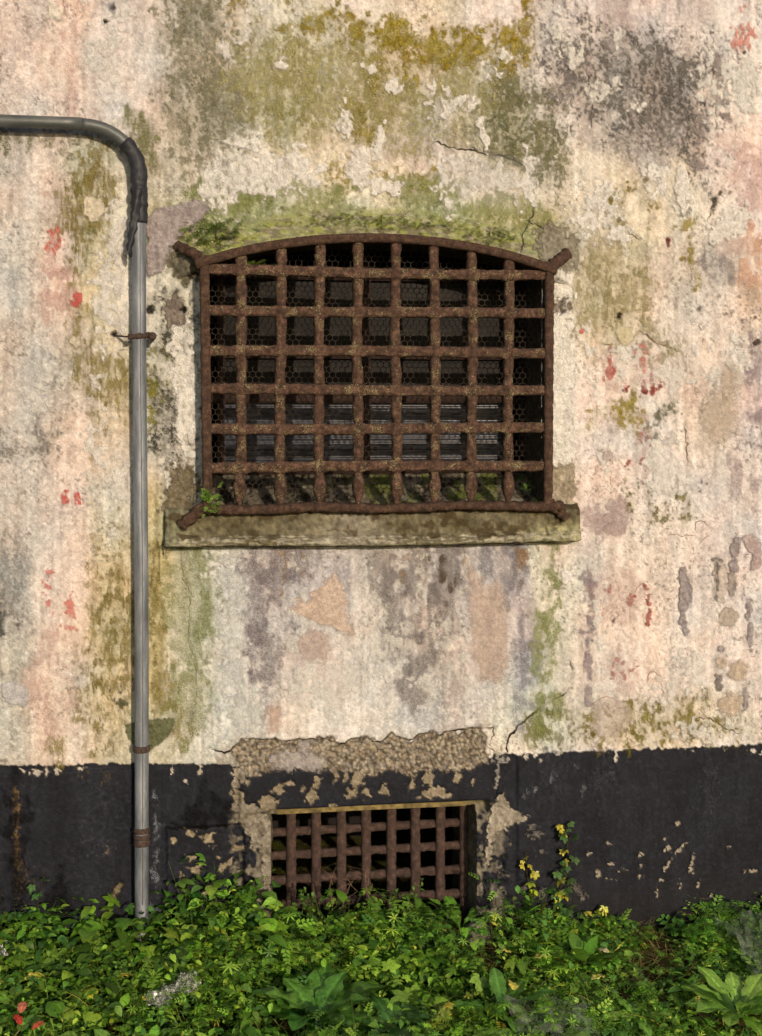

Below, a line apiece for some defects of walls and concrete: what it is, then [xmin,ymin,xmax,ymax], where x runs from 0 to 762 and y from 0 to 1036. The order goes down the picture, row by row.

peeling [385,77,404,95]
peeling [484,48,513,81]
peeling [335,97,405,197]
peeling [423,78,540,221]
crack [436,141,544,254]
peeling [413,547,428,613]
flaking render [288,573,356,661]
peeling [387,623,411,657]
peeling [406,673,441,700]
flaking render [217,706,544,891]
peeling [150,816,216,882]
peeling [178,856,201,893]